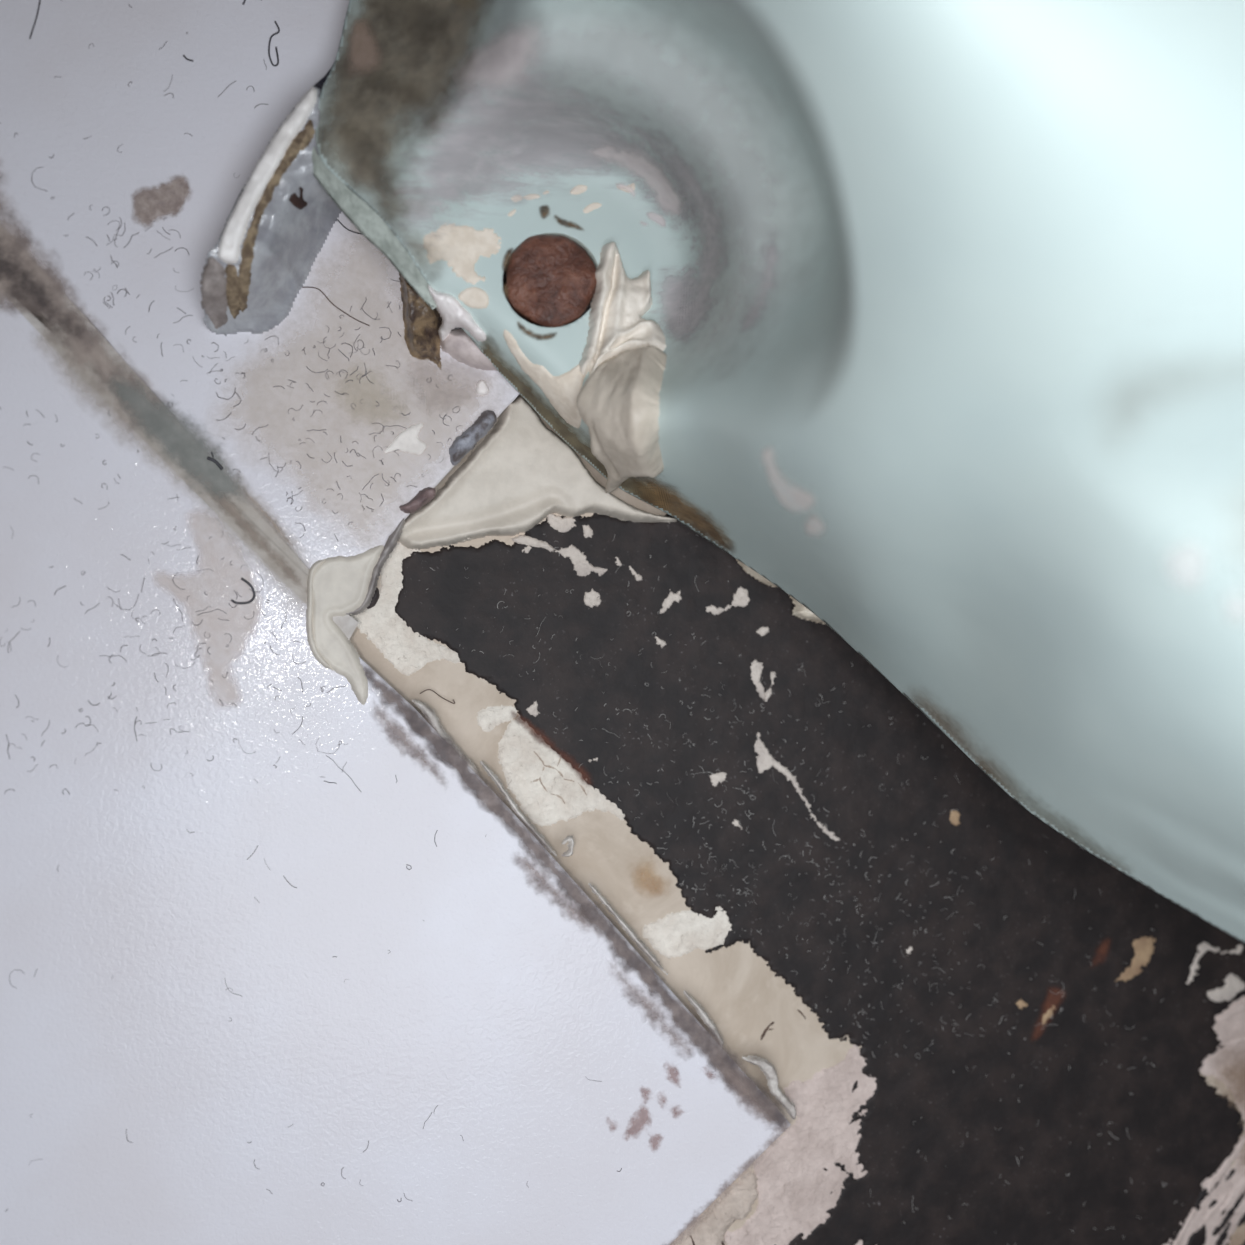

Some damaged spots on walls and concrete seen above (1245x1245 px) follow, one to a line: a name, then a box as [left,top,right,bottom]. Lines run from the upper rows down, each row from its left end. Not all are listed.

rust [540,206,581,229]
water stain [0,259,61,321]
rust [518,323,555,340]
peeling [449,380,497,466]
water stain [116,383,297,581]
peeling [547,513,642,609]
peeling [660,589,682,614]
peeling [706,586,750,615]
peeling [750,660,776,702]
peeling [754,732,840,841]
peeling [1186,942,1243,984]
peeling [1207,973,1245,1002]